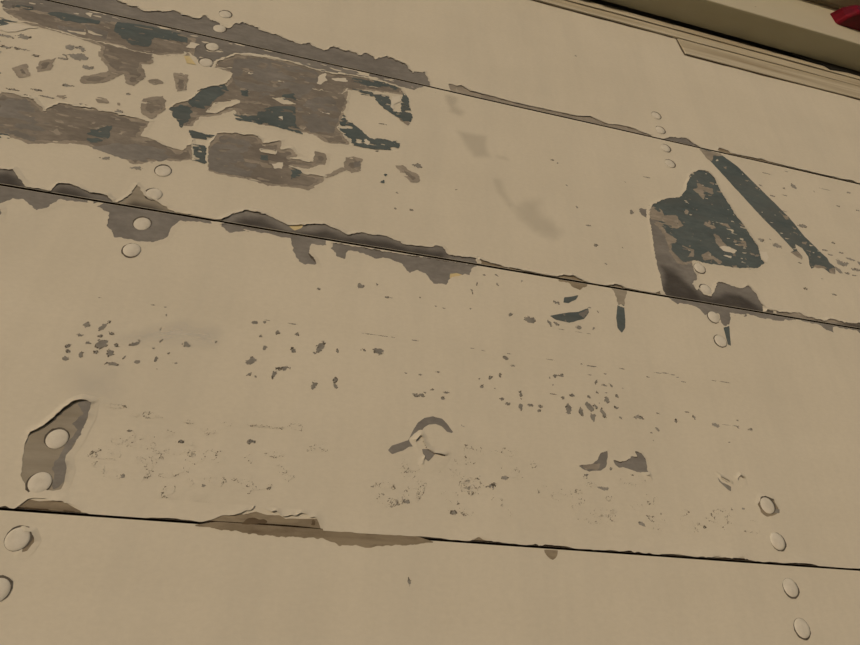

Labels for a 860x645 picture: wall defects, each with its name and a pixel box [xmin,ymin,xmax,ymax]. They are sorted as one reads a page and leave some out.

peeling [0,0,432,193]
peeling [444,81,860,346]
peeling [62,321,140,366]
peeling [479,373,543,412]
peeling [549,363,622,422]
peeling [371,416,537,522]
peeling [573,447,653,482]
peeling [211,527,428,548]